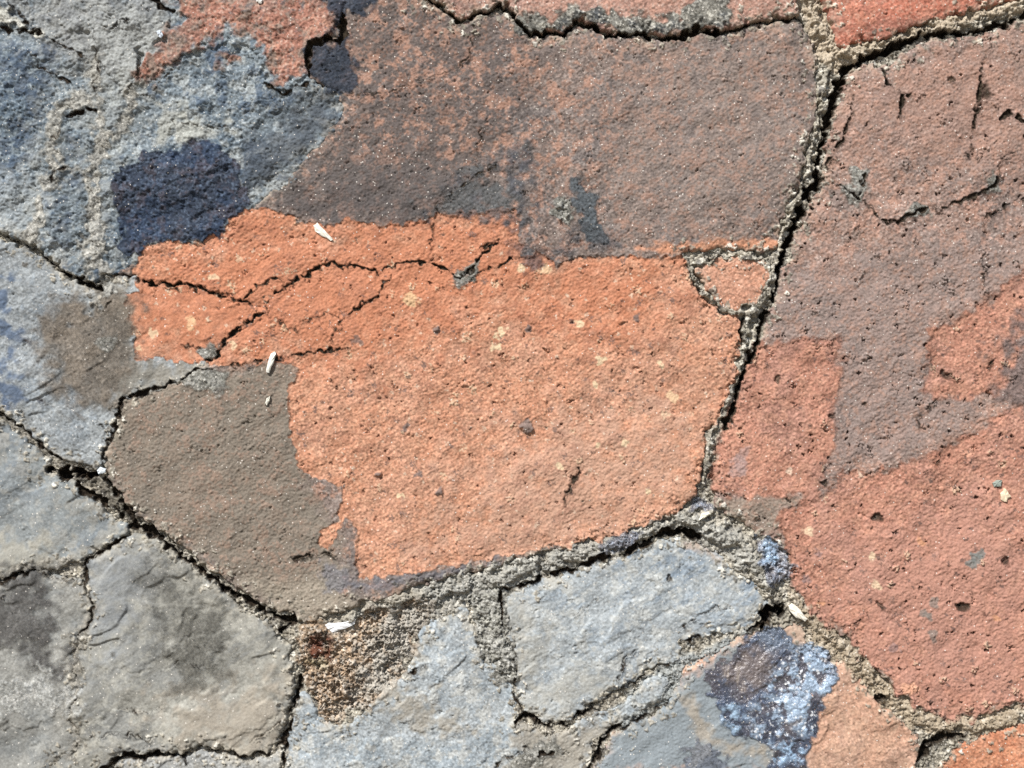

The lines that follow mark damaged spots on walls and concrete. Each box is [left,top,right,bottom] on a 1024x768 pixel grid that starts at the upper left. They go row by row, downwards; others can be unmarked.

crack [0,127,520,651]
crack [721,12,1024,431]
crack [100,674,304,768]